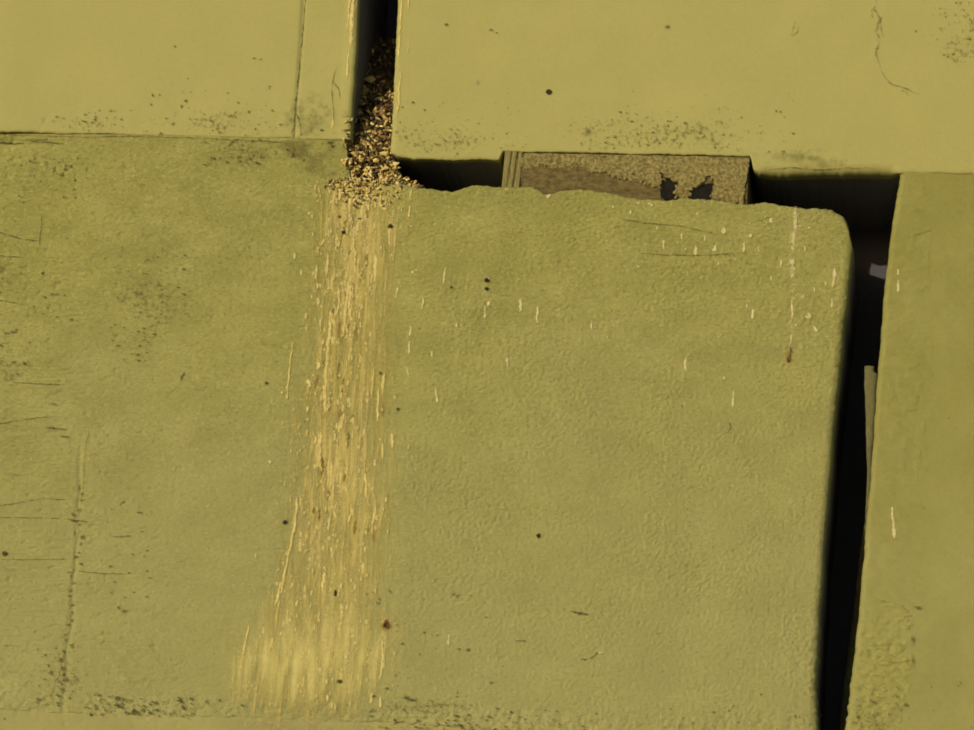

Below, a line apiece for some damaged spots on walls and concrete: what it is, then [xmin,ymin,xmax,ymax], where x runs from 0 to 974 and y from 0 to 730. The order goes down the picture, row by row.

spalling [660,172,678,200]
spalling [688,182,714,200]
spalling [41,604,221,719]